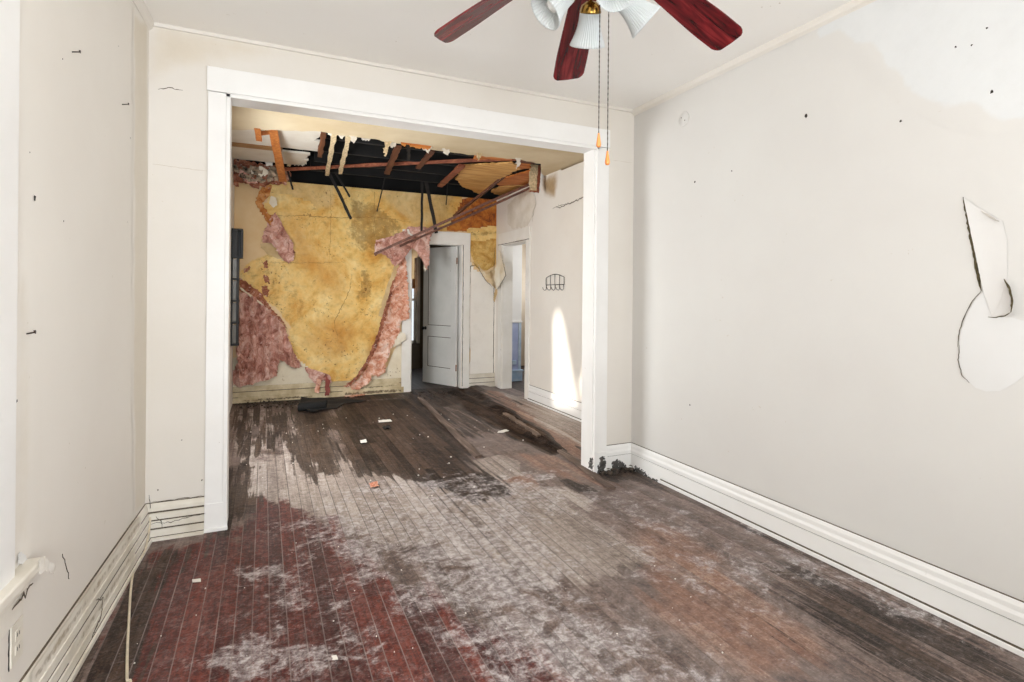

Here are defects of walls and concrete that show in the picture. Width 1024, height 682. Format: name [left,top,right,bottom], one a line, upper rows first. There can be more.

peeling [383,141,450,160]
peeling [262,260,270,297]
peeling [467,190,536,374]
flaking render [957,197,1024,392]
peeling [233,359,325,393]
peeling [351,344,401,390]